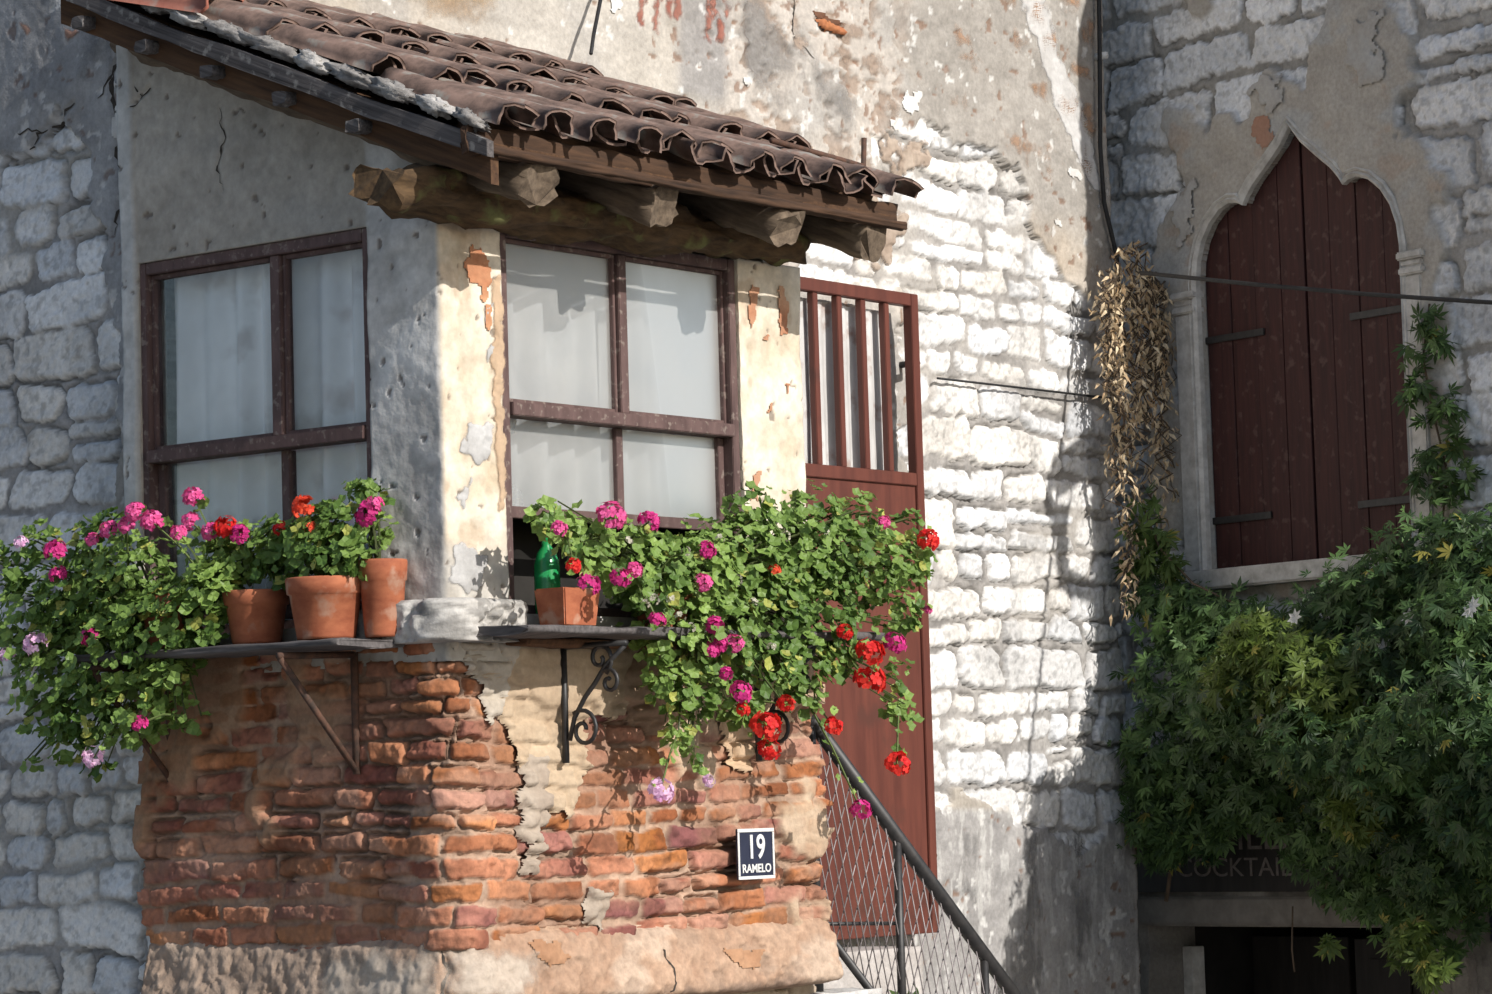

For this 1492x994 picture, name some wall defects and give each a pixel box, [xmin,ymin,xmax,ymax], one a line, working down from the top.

peeling [813,10,879,74]
crack [18,64,151,167]
crack [216,110,226,184]
peeling [879,90,932,176]
spalling [1068,160,1091,180]
peeling [1247,73,1284,150]
peeling [855,211,909,271]
peeling [456,244,507,511]
spalling [449,542,488,594]
peeling [451,642,641,875]
peeling [717,660,809,782]
peeling [581,887,614,932]